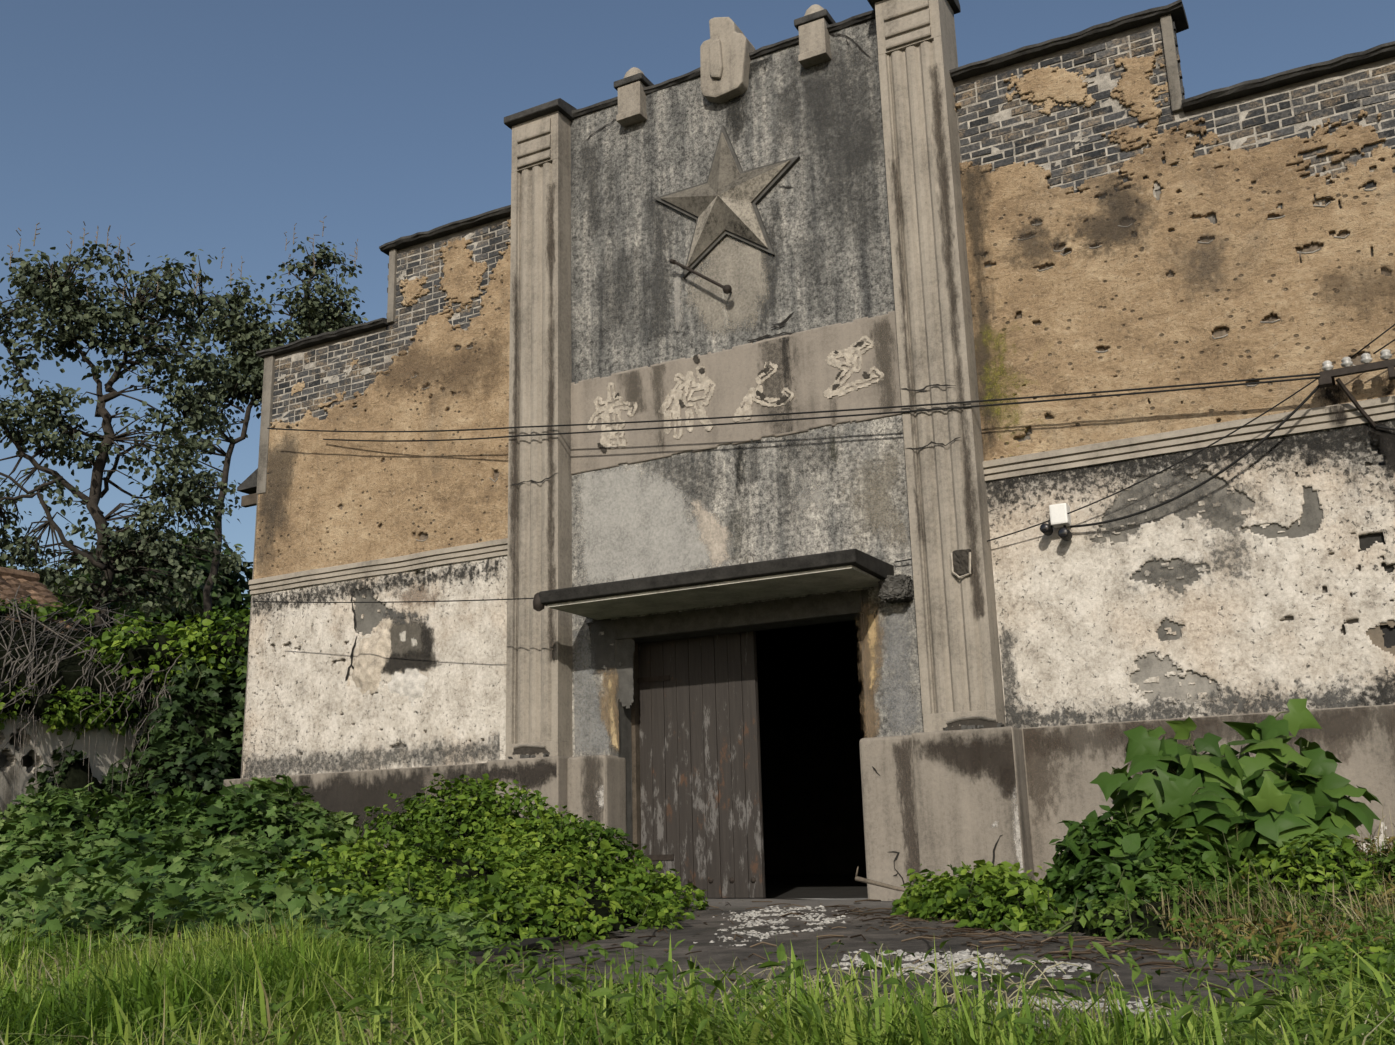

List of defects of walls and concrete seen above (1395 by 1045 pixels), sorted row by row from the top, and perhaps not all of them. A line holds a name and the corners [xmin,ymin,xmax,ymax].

leakage [726,94,747,142]
peeling [955,22,1395,209]
leakage [581,145,601,231]
leakage [778,47,914,428]
peeling [272,221,511,429]
leakage [930,67,1394,617]
peeling [1090,468,1324,546]
peeling [1130,558,1210,595]
peeling [1130,617,1221,707]
spalling [1366,620,1395,656]
leakage [240,735,557,842]
leakage [883,611,1395,887]